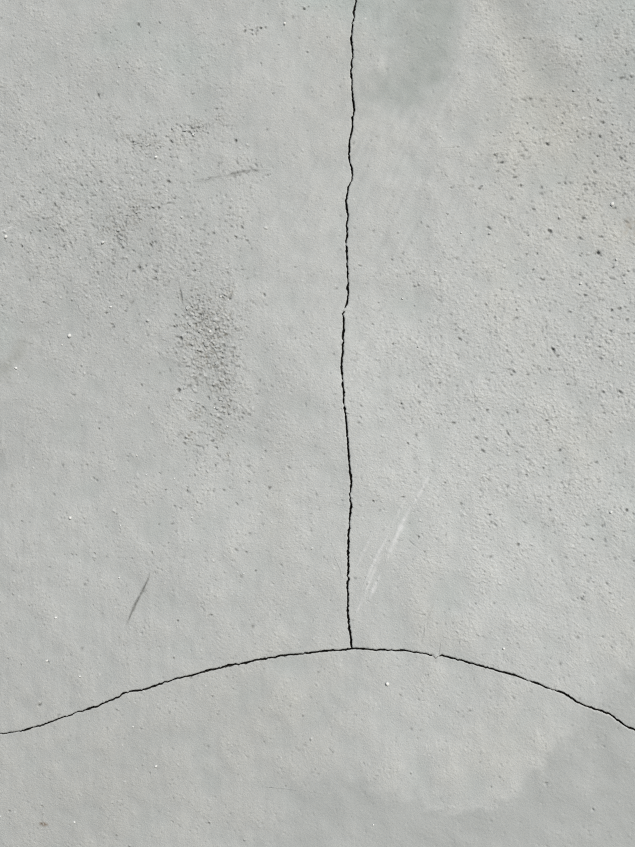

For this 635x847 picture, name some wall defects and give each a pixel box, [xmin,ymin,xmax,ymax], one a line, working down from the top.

crack [0,0,527,734]
crack [530,681,635,731]